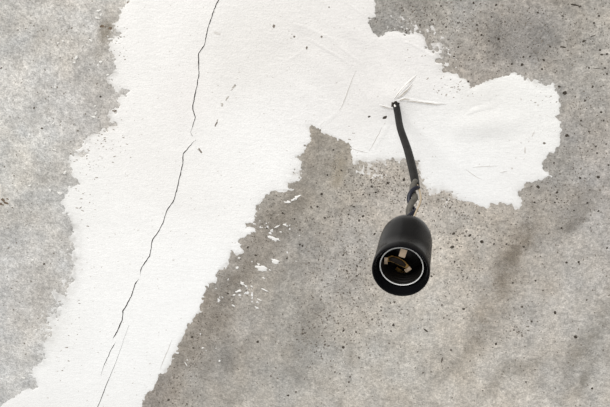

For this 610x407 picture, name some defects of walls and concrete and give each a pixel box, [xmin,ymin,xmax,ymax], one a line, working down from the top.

crack [97,0,219,407]